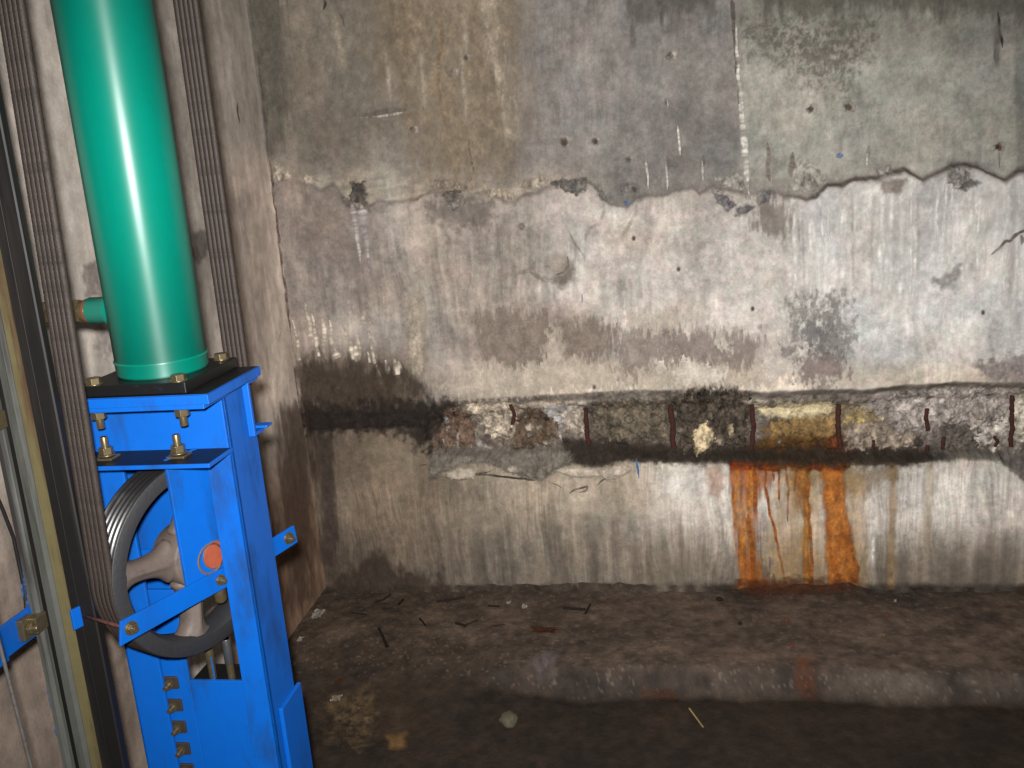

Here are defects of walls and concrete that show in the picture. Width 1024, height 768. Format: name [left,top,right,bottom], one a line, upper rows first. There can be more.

leakage [279,296,425,607]
spalling [445,468,476,480]
spalling [554,464,631,480]
leakage [475,308,766,385]
spalling [428,308,1024,456]
rust [730,409,881,596]
leakage [761,194,857,390]
leakage [877,180,917,305]
leakage [933,182,1021,333]